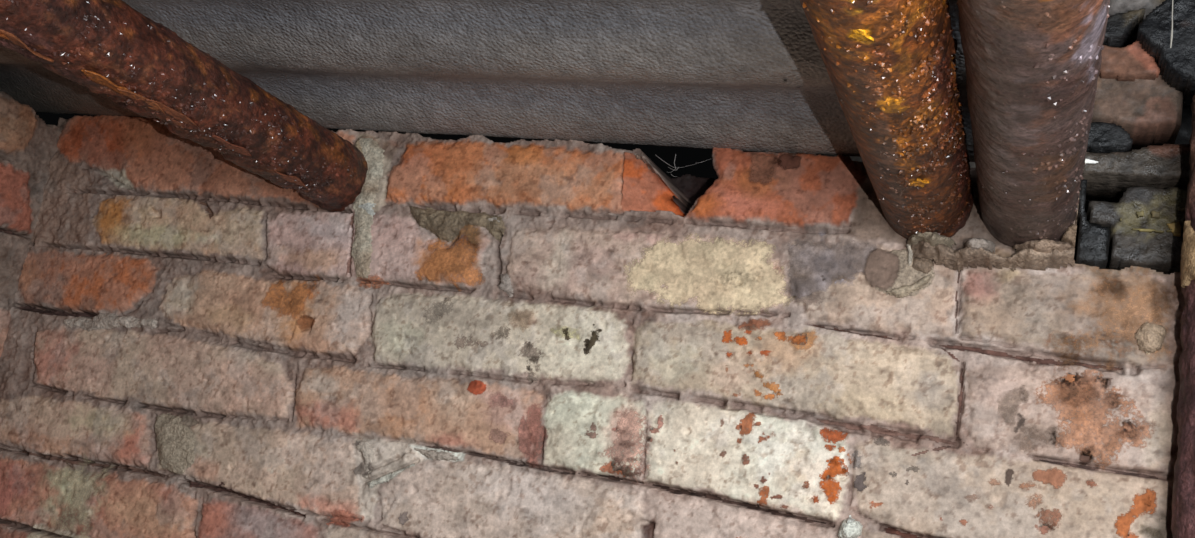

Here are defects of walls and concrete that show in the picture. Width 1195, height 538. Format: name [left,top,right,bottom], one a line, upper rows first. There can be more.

corrosion [0,29,54,62]
corrosion [848,29,874,41]
corrosion [81,69,252,157]